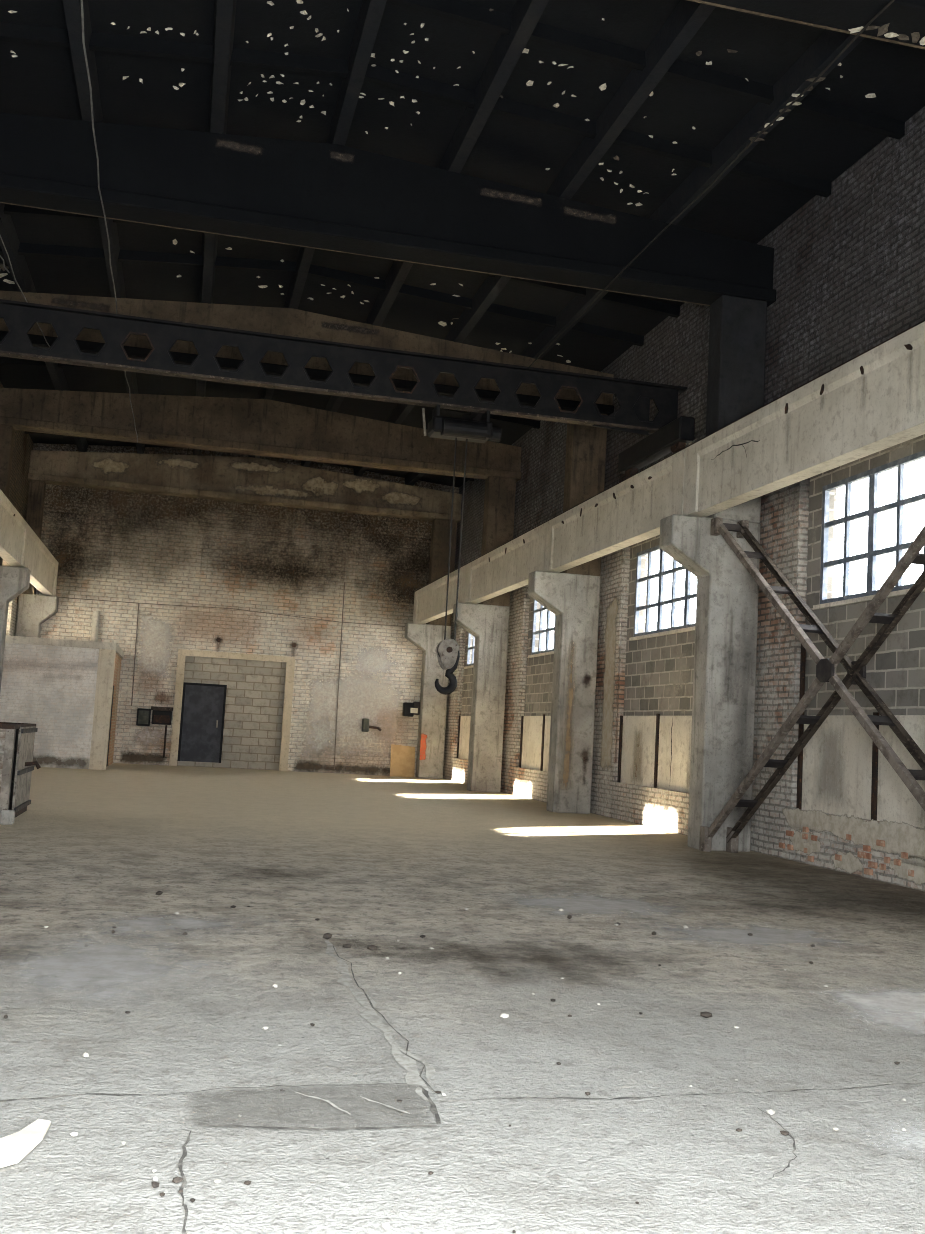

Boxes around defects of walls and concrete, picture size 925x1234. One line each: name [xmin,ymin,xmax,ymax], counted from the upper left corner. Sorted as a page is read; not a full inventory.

peeling [290,0,339,41]
peeling [238,74,332,122]
peeling [156,458,199,469]
peeling [228,461,421,506]
water stain [48,529,89,586]
water stain [223,555,333,587]
crack [333,946,925,1179]
crack [0,1085,308,1102]
crack [178,1131,191,1234]